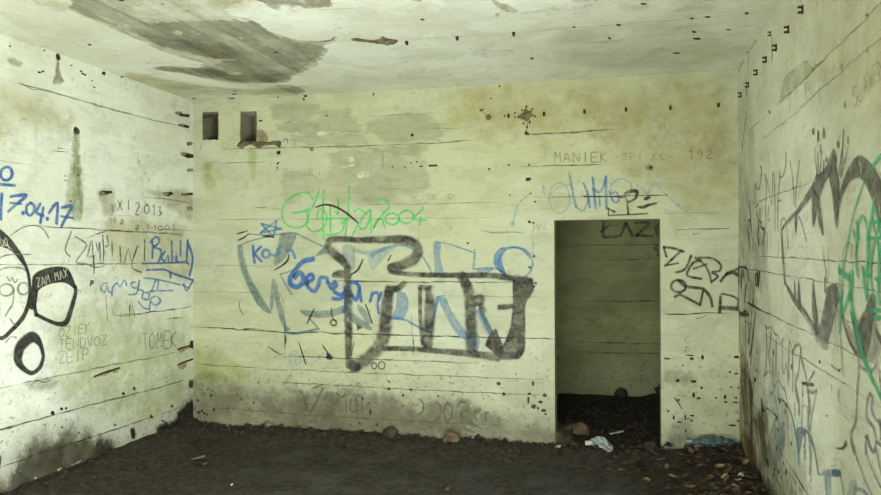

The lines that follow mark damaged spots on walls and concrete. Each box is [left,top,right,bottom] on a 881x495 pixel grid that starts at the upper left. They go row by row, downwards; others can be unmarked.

leakage [0,426,115,493]
corrosion [739,359,771,466]